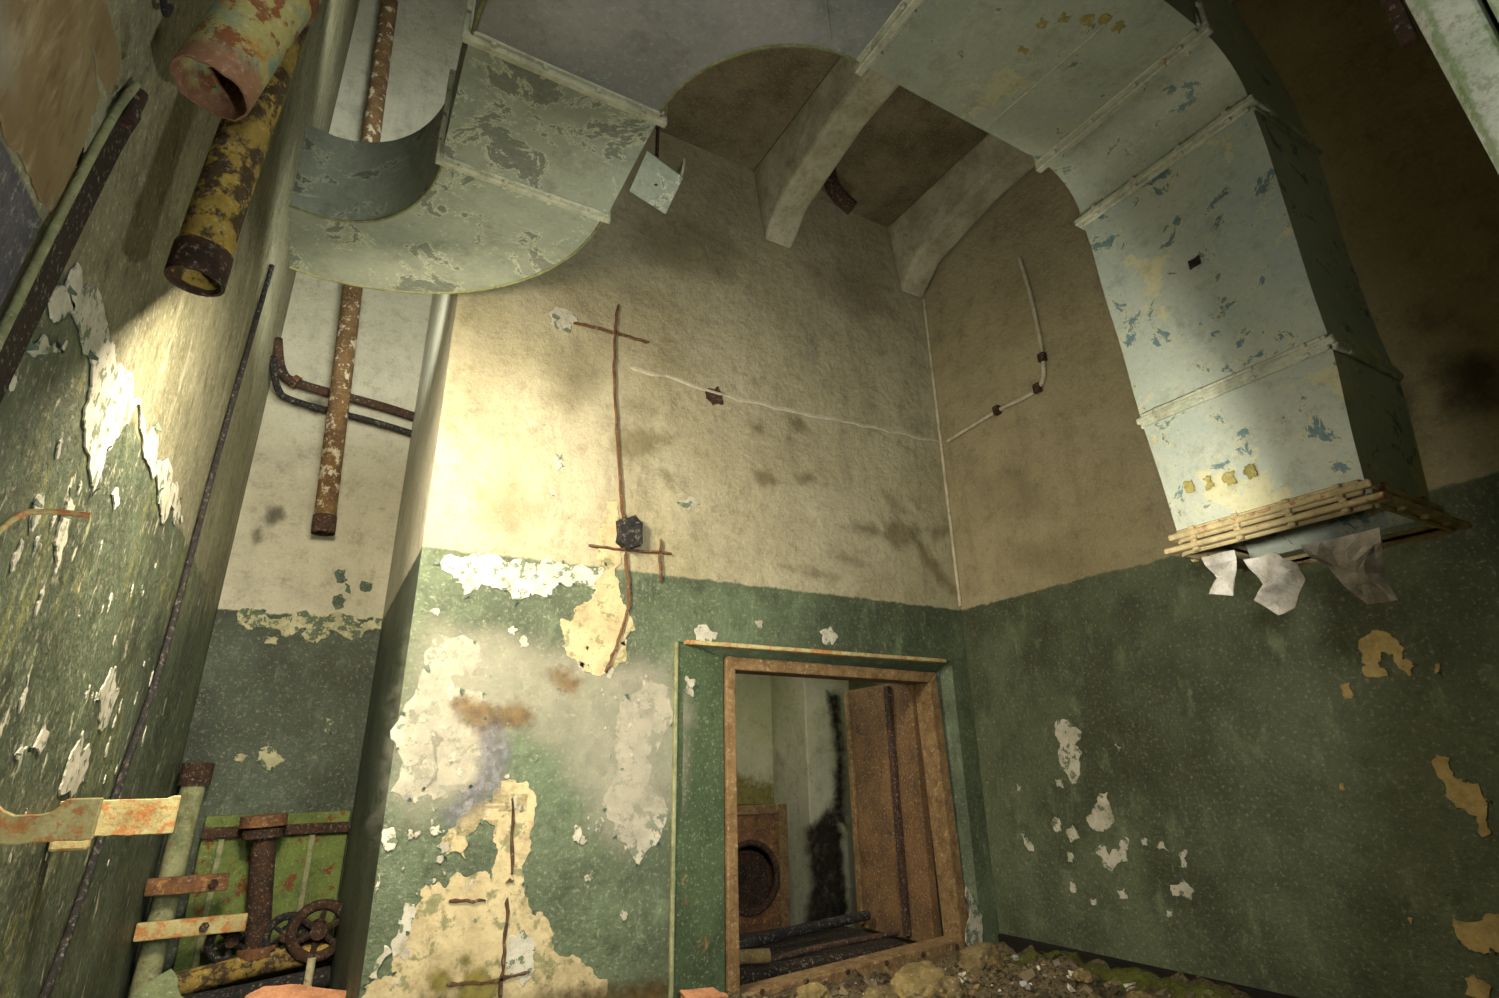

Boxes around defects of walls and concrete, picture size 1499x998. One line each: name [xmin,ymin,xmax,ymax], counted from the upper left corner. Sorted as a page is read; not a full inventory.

peeling [10,263,183,617]
peeling [236,569,382,648]
peeling [433,304,696,870]
peeling [1340,630,1442,699]
peeling [234,746,304,772]
flaking render [361,634,608,998]
peeling [1020,833,1034,852]
peeling [1055,719,1082,788]
peeling [1053,792,1194,918]
peeling [1432,755,1492,838]
peeling [1453,913,1499,955]
peeling [1465,973,1492,998]